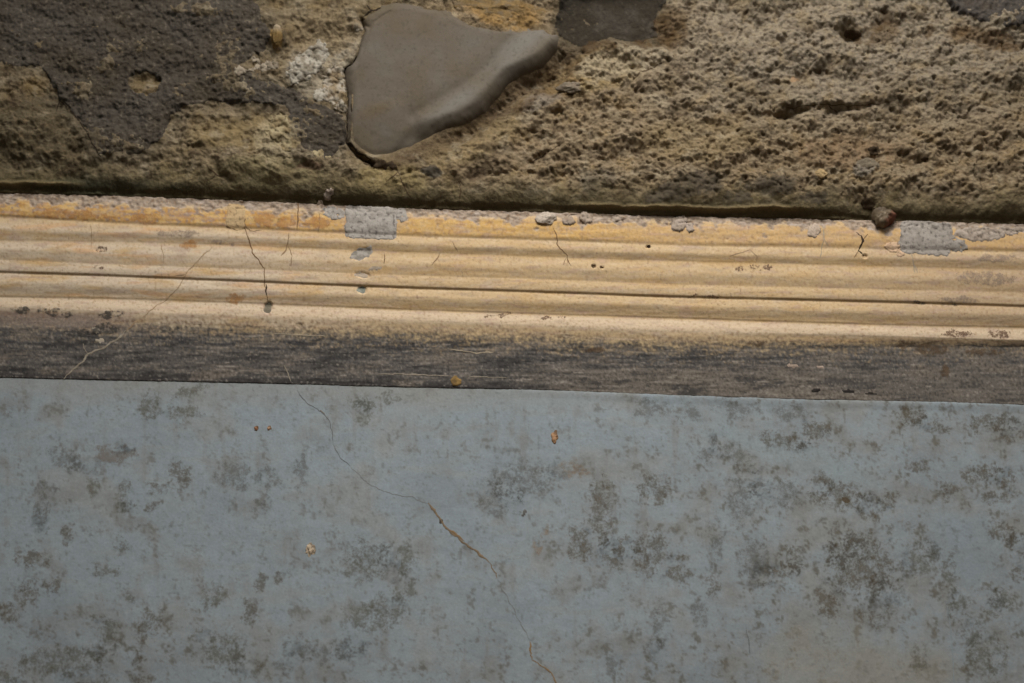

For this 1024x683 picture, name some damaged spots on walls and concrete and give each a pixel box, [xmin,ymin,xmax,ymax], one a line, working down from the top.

crack [244,203,320,301]
peeling [396,208,408,222]
peeling [938,235,968,253]
crack [63,245,210,380]
crack [298,392,557,683]